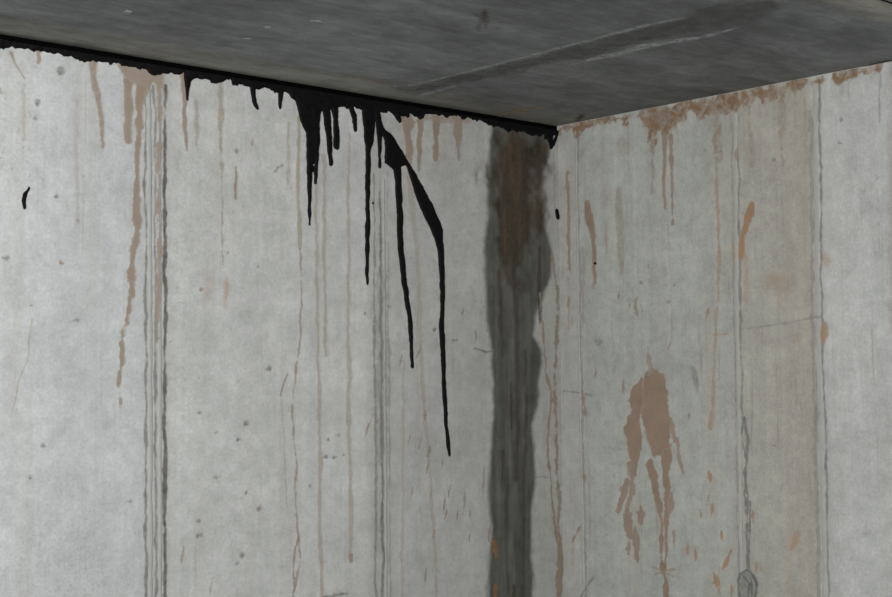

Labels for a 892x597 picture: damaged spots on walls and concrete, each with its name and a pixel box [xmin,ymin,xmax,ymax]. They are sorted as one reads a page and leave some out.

leakage [408,1,778,96]
corrosion [559,63,883,225]
leakage [0,39,559,597]
leakage [616,353,684,597]